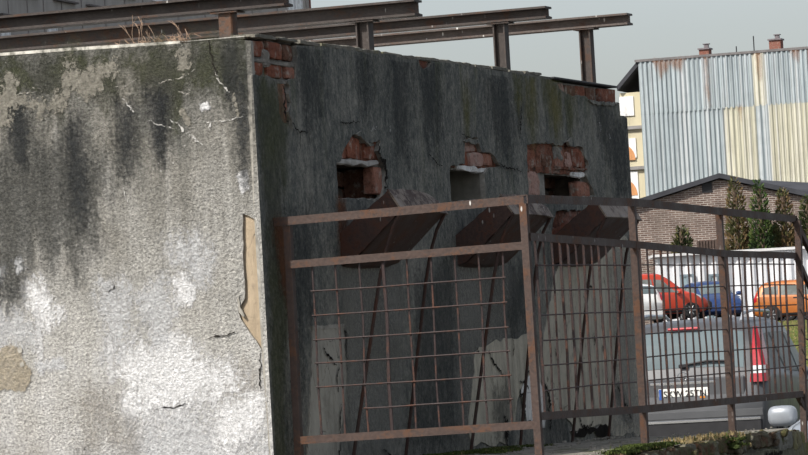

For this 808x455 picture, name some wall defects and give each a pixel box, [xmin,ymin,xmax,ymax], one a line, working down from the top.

spalling [253,41,295,123]
spalling [558,84,619,106]
spalling [336,126,388,195]
spalling [450,138,497,174]
spalling [527,137,590,196]
water stain [0,32,288,455]
spalling [237,214,261,346]
peeling [0,345,31,392]
peeling [306,265,404,455]
peeling [467,235,640,446]